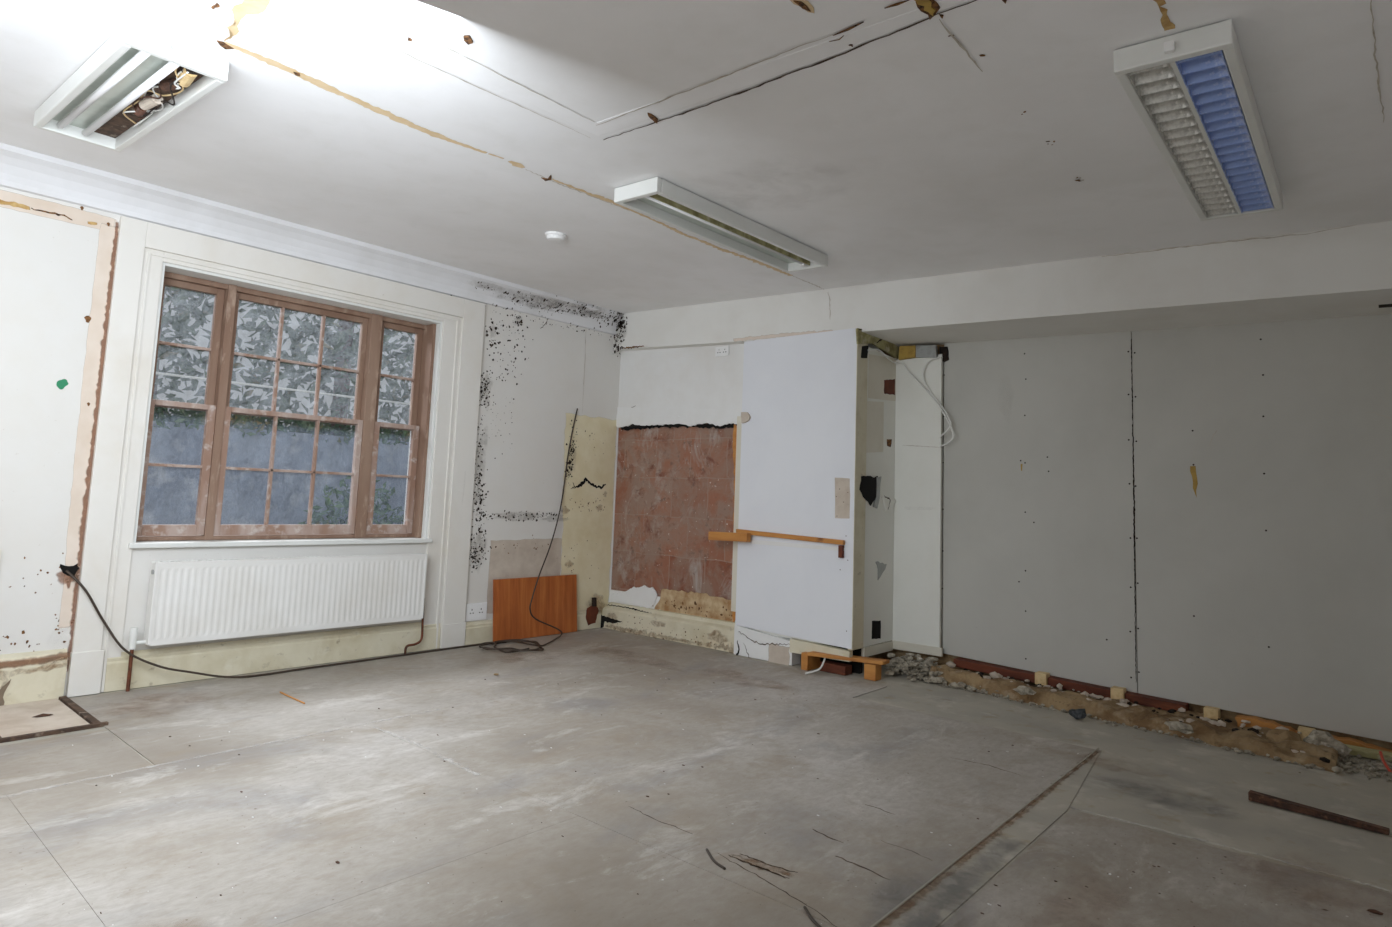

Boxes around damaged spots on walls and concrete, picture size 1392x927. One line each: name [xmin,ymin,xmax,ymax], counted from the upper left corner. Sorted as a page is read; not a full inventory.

flaking render [915,0,944,19]
peeling [1154,0,1175,31]
peeling [0,199,97,225]
peeling [211,0,822,289]
damp [469,282,627,569]
flaking render [487,413,737,622]